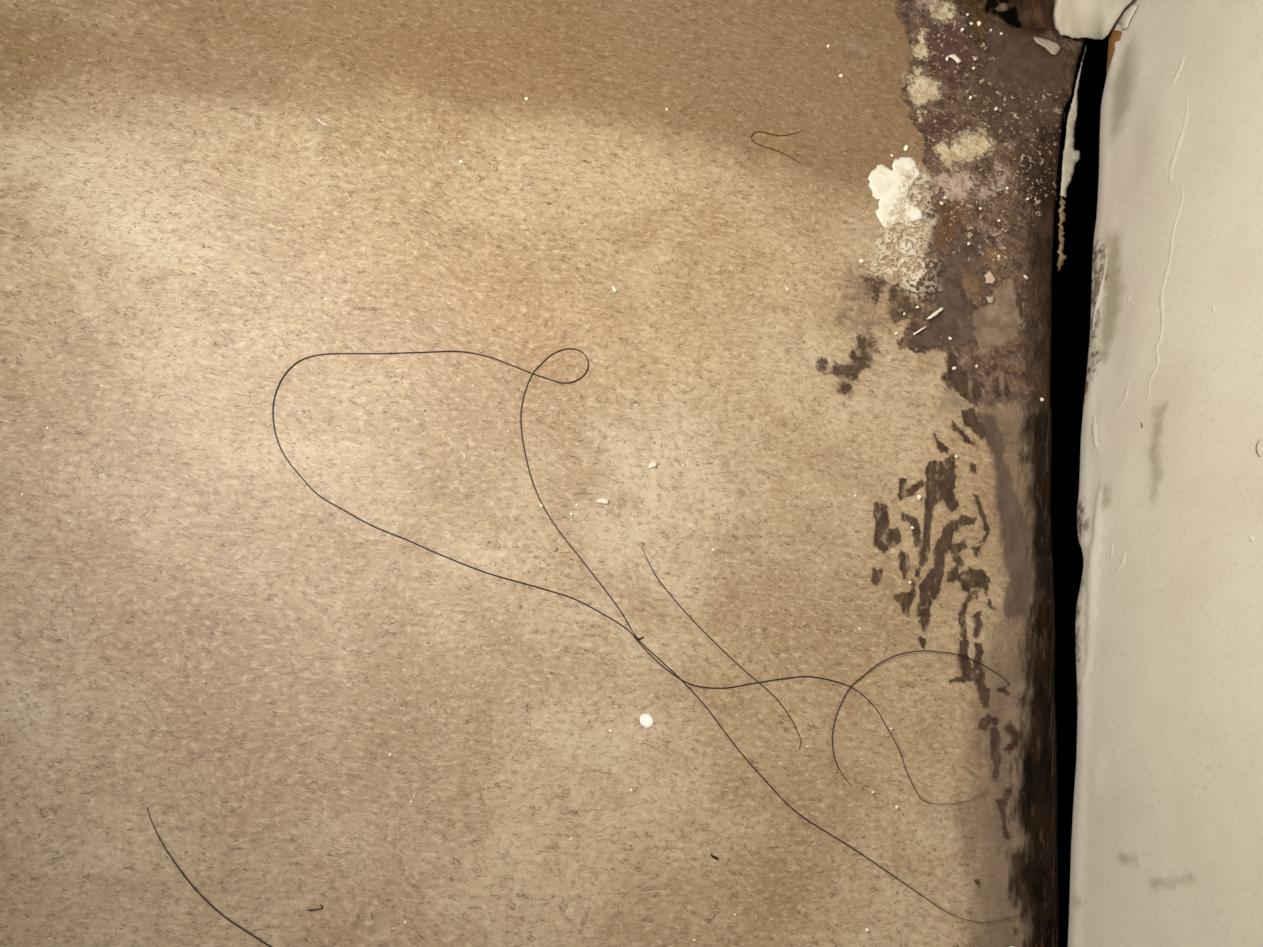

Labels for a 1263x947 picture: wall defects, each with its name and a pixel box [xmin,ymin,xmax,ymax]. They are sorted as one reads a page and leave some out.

spalling [984,0,1021,26]
peeling [1053,0,1138,271]
water stain [816,0,1086,947]